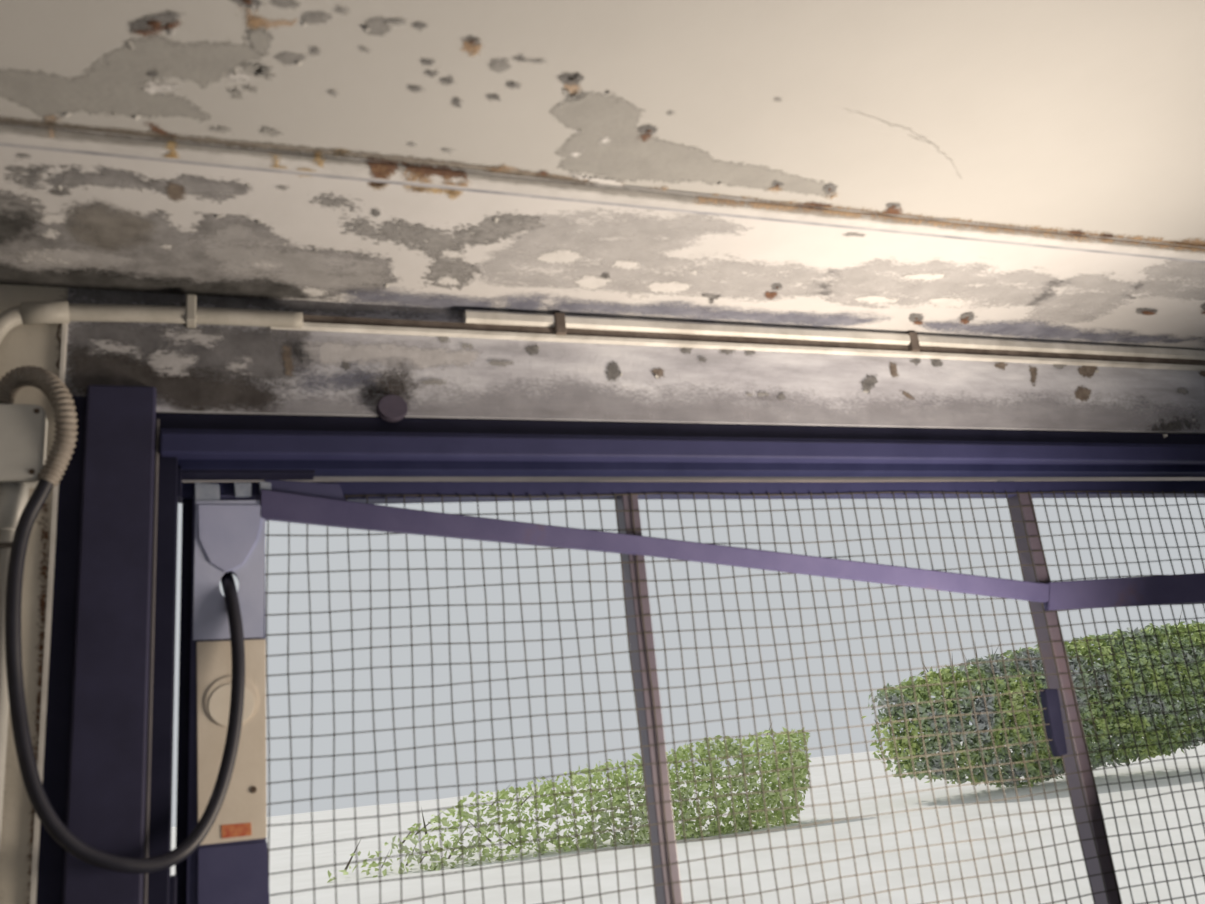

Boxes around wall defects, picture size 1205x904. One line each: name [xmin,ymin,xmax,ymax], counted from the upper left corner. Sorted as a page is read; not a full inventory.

peeling [0,0,347,134]
peeling [360,18,427,52]
peeling [409,60,453,92]
peeling [461,36,543,100]
peeling [488,74,837,200]
leakage [166,183,185,202]
corrosion [0,115,1205,253]
leakage [0,211,41,245]
peeling [0,155,1205,325]
leakage [0,264,875,327]
leakage [923,321,1202,344]
leakage [61,321,418,413]